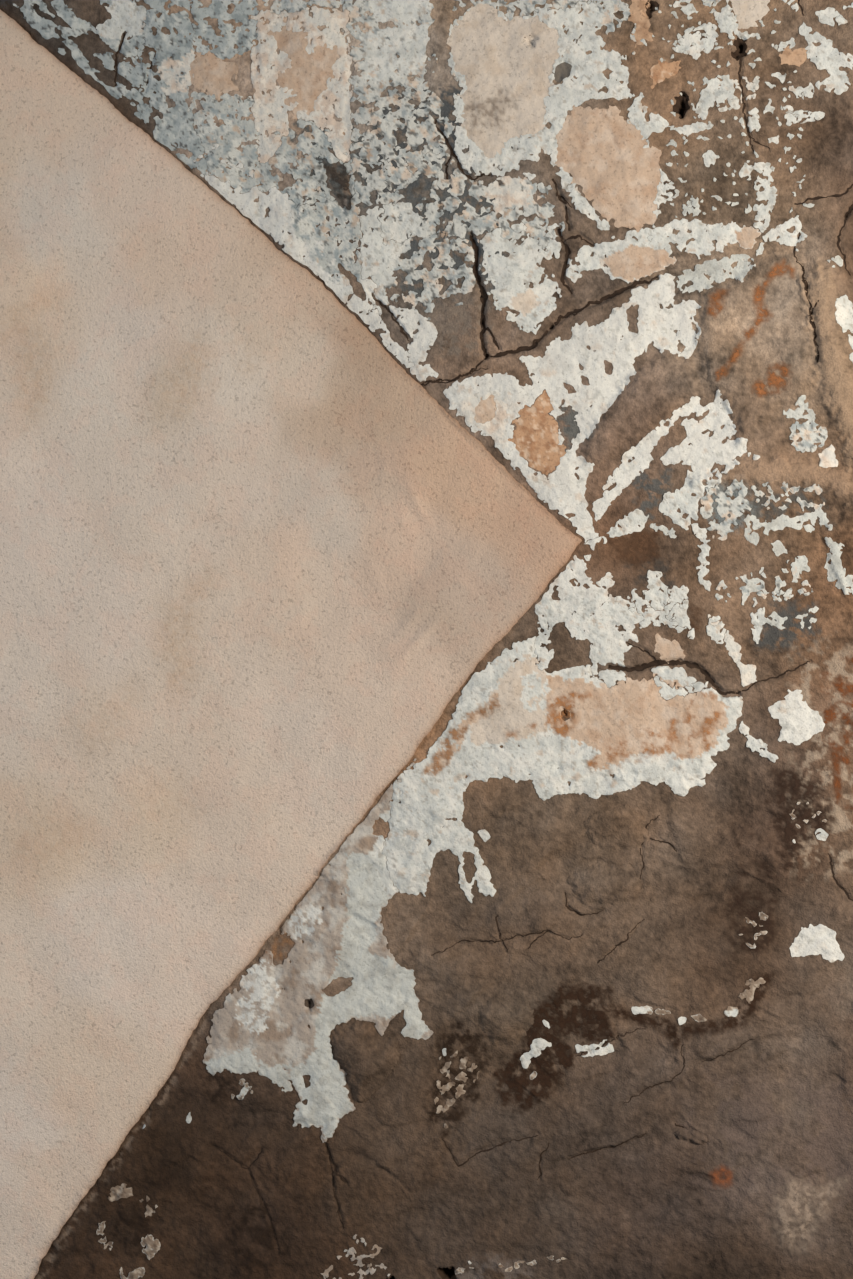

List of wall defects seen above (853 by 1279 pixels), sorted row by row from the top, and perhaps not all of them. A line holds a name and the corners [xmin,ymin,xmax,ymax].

crack [737,37,770,152]
peeling [734,22,853,146]
crack [435,120,490,186]
peeling [13,0,838,591]
crack [420,179,657,386]
crack [794,184,853,363]
peeling [735,540,819,644]
crack [609,642,810,695]
peeling [768,689,825,745]
peeling [203,554,779,1143]
crack [431,892,603,956]
peeling [790,924,844,962]